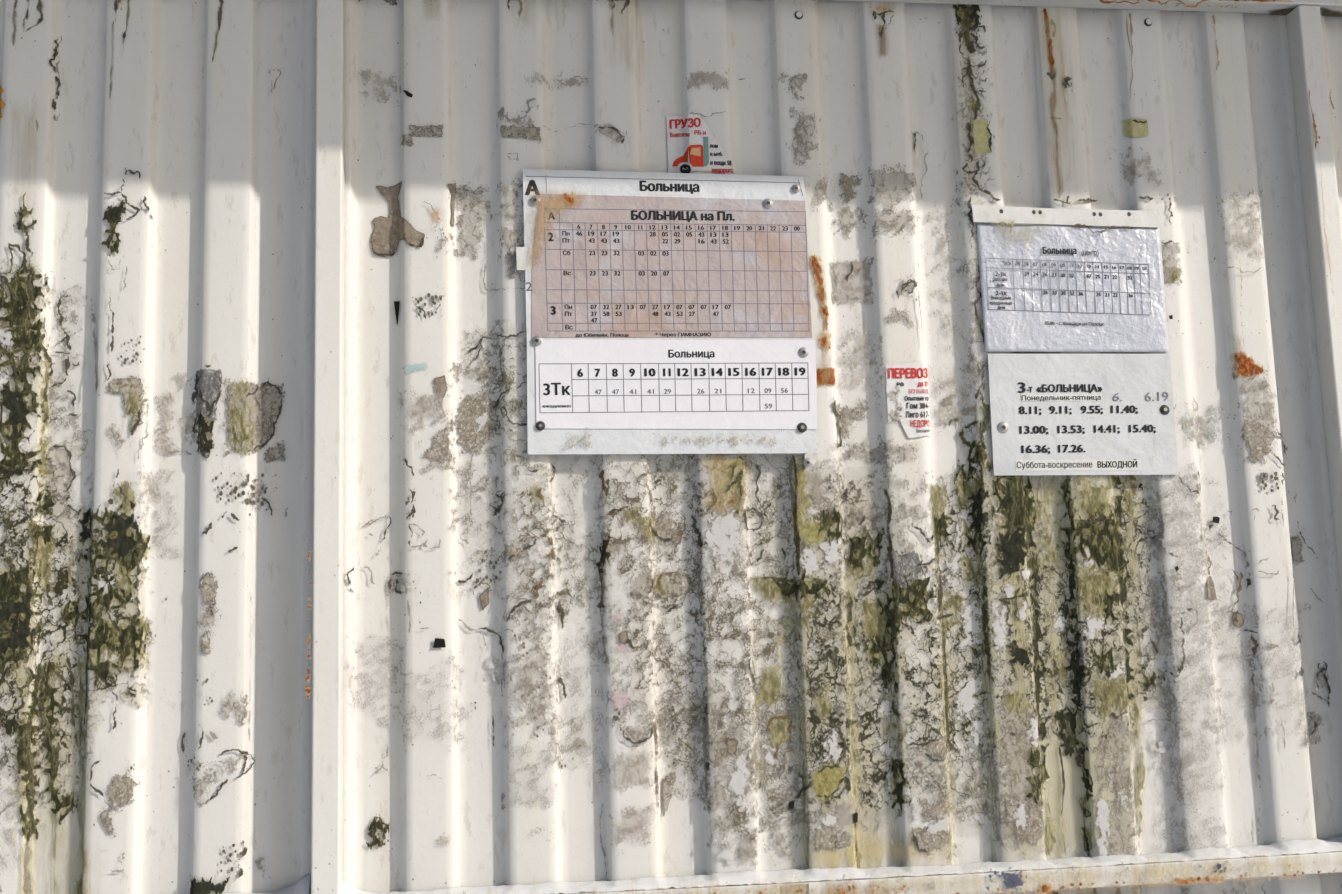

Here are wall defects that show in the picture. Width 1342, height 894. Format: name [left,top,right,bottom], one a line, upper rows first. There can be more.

water stain [38,360,52,487]
peeling [106,365,288,557]
peeling [371,177,525,292]
peeling [399,361,505,610]
corrosion [811,255,835,386]
water stain [1024,478,1056,856]
water stain [1060,478,1093,856]
water stain [1115,476,1145,847]
corrosion [1232,351,1264,377]
peeling [1174,370,1331,748]
peeling [599,671,795,876]
corrosion [1024,877,1094,893]